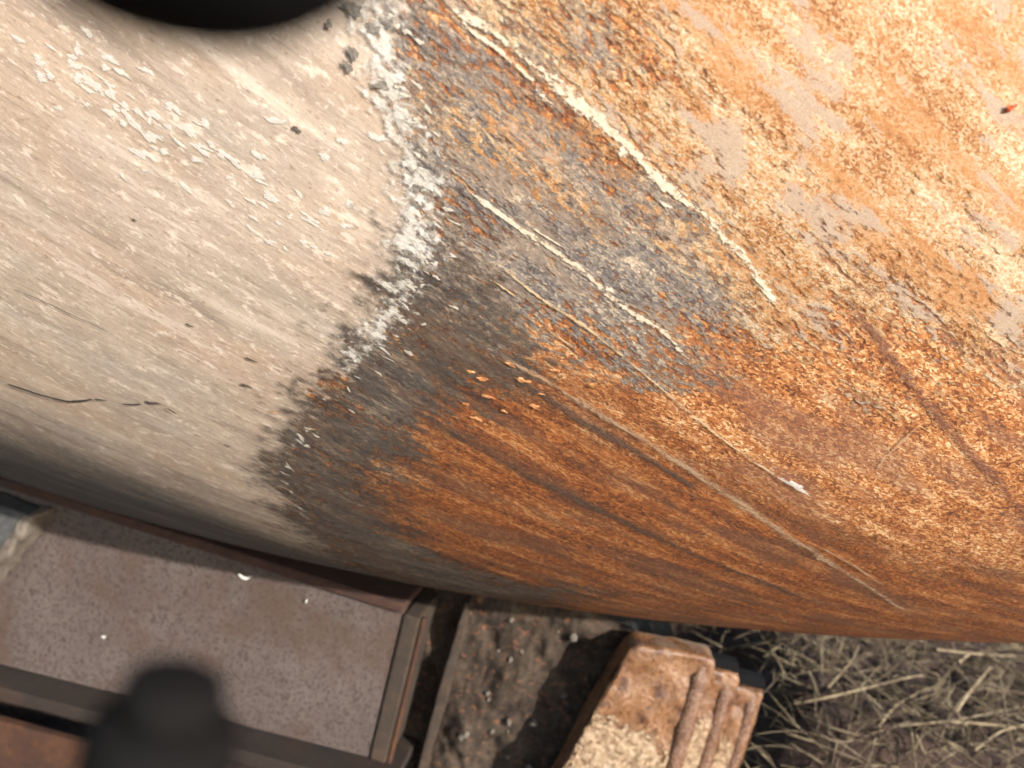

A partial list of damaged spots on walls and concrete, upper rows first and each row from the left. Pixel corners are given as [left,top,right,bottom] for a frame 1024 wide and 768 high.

peeling [34,54,54,83]
peeling [264,116,301,133]
peeling [46,28,288,251]
peeling [276,207,330,230]
corrosion [266,0,1024,643]
crack [8,384,141,405]
damp [244,239,800,608]